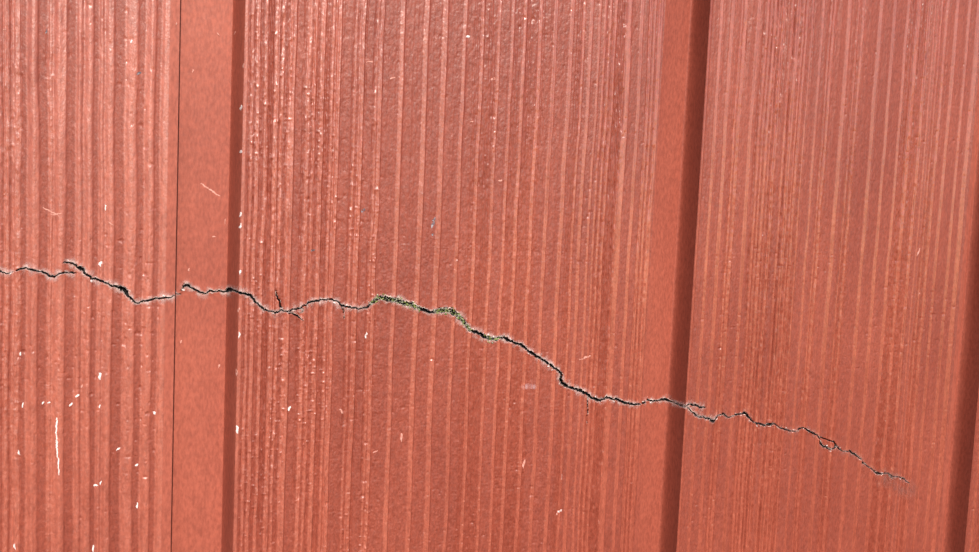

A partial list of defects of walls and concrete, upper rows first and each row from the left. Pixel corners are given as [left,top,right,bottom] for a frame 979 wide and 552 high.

crack [0,260,909,483]